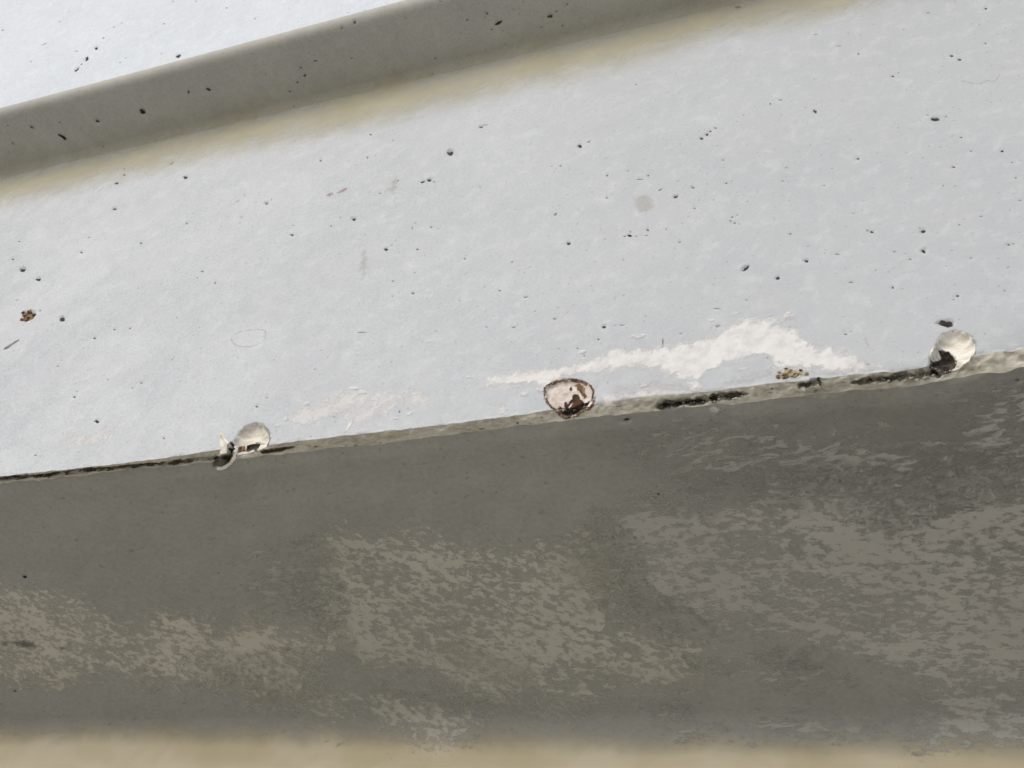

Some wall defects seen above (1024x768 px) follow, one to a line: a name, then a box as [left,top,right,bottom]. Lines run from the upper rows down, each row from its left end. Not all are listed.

peeling [0,331,1024,756]
damp [486,312,882,405]